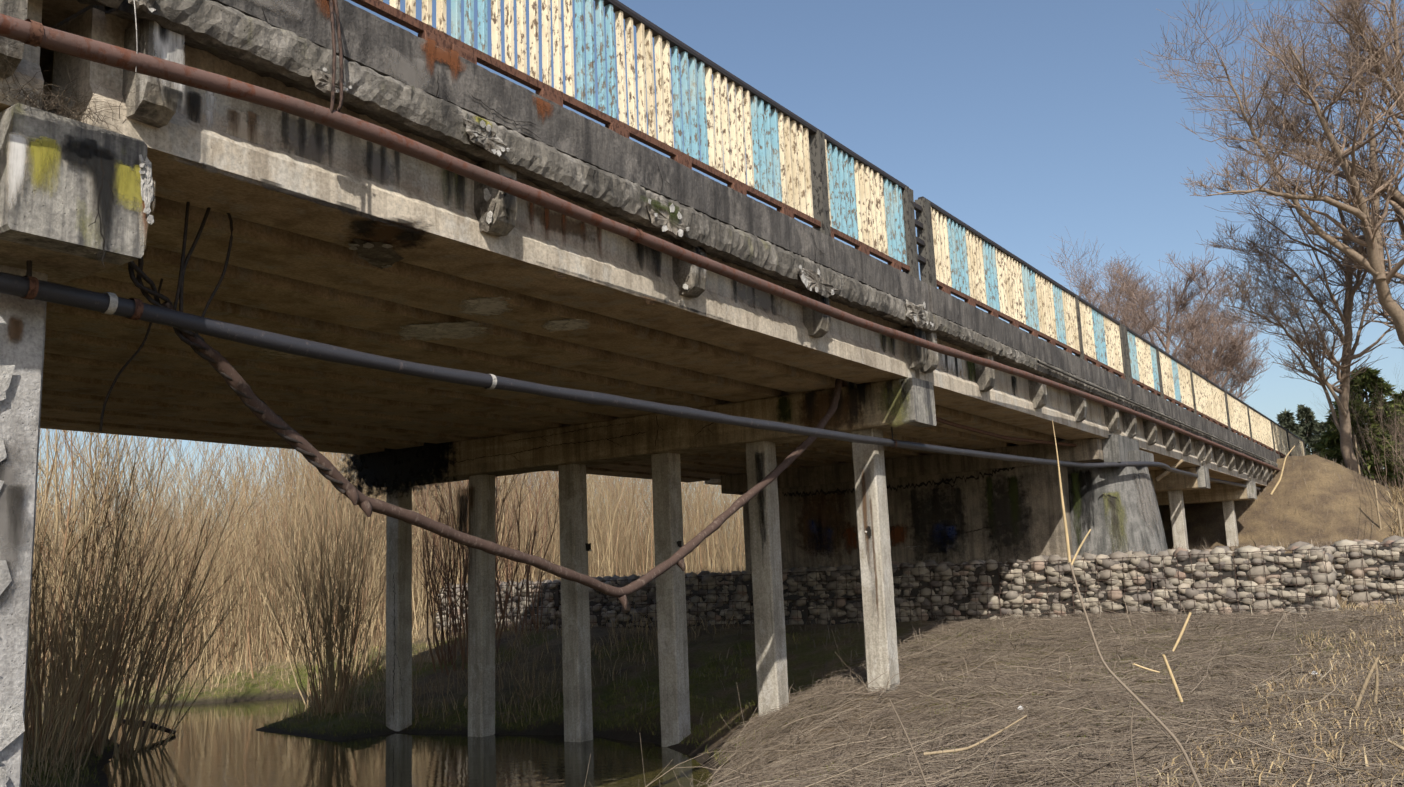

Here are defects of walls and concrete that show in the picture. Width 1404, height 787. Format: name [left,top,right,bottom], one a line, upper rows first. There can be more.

water stain [154,22,182,64]
corrosion [423,38,464,75]
water stain [163,83,334,163]
water stain [364,141,400,183]
water stain [443,169,464,202]
spalling [0,365,15,401]
water stain [906,485,966,561]
water stain [980,476,1032,558]
spalling [0,560,12,595]
spalling [0,704,25,787]